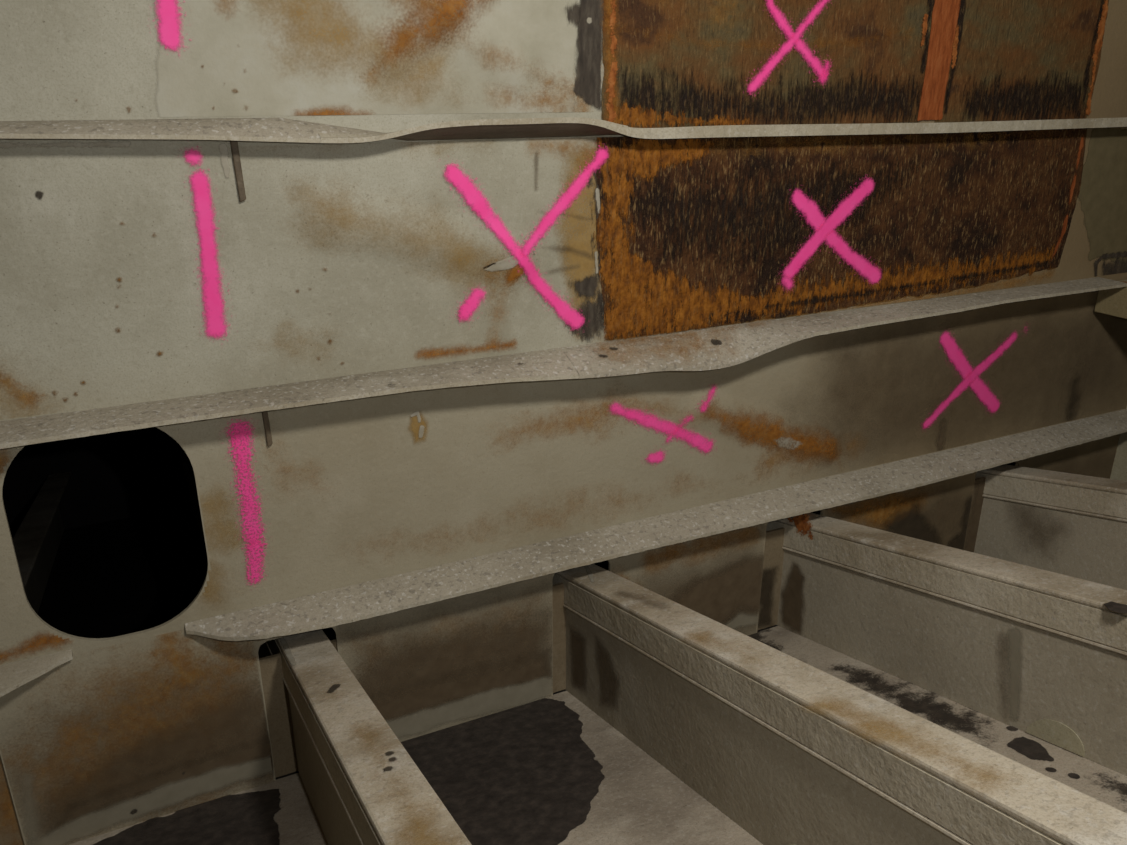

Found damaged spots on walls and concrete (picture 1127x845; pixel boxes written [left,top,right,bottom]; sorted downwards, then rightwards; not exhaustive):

rust [280,0,484,78]
rust [594,0,1109,352]
rust [707,410,836,465]
water stain [659,557,804,651]
water stain [1104,601,1127,614]
water stain [26,697,281,845]
water stain [360,624,605,845]
water stain [833,665,991,734]
water stain [1006,629,1080,779]
water stain [1099,774,1127,801]